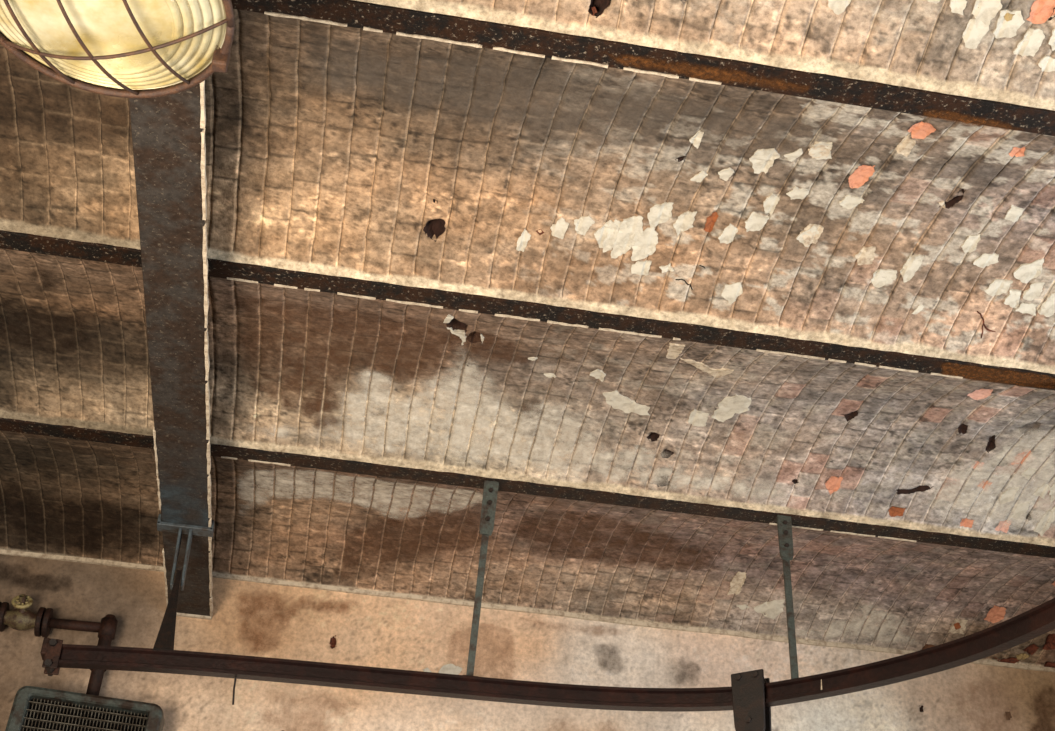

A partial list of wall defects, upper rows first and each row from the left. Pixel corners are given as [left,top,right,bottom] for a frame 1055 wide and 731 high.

spalling [588,0,610,18]
peeling [927,0,1055,72]
peeling [749,141,833,174]
peeling [516,186,809,276]
peeling [796,223,824,247]
peeling [855,246,924,288]
peeling [984,258,1055,324]
leakage [237,299,750,493]
peeling [590,369,650,416]
peeling [688,394,752,427]
leakage [239,470,483,575]
leakage [522,513,711,569]